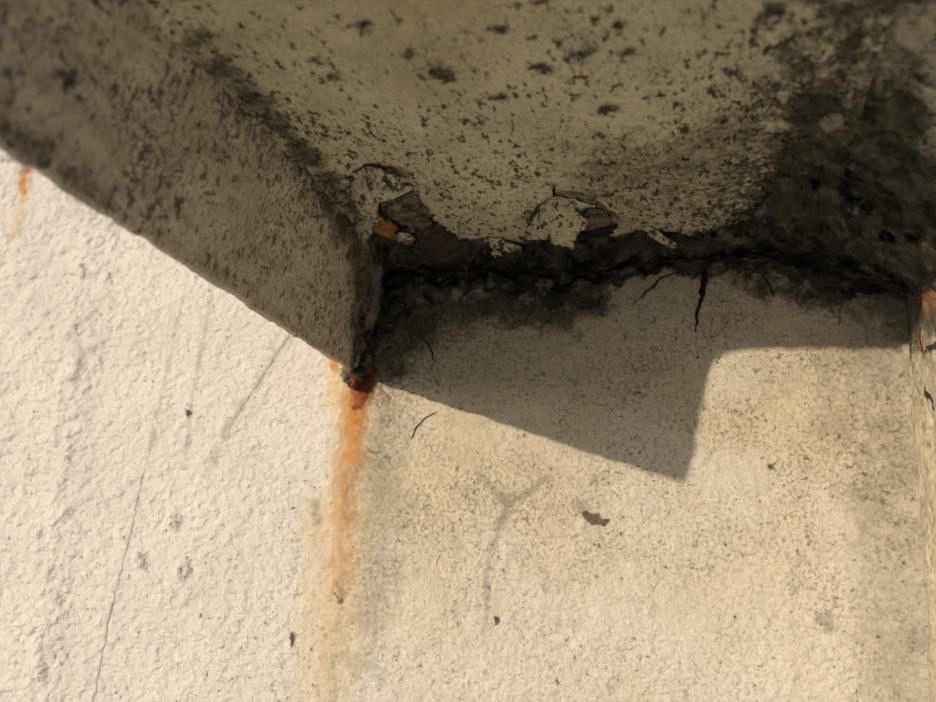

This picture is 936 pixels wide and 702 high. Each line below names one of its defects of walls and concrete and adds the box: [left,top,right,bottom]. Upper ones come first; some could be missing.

rust [19,168,30,192]
spalling [346,165,471,267]
spalling [483,183,619,258]
damp [204,0,936,382]
peeling [640,226,678,249]
crack [633,269,708,333]
crack [924,327,936,353]
rust [344,366,377,463]
crack [924,386,935,411]